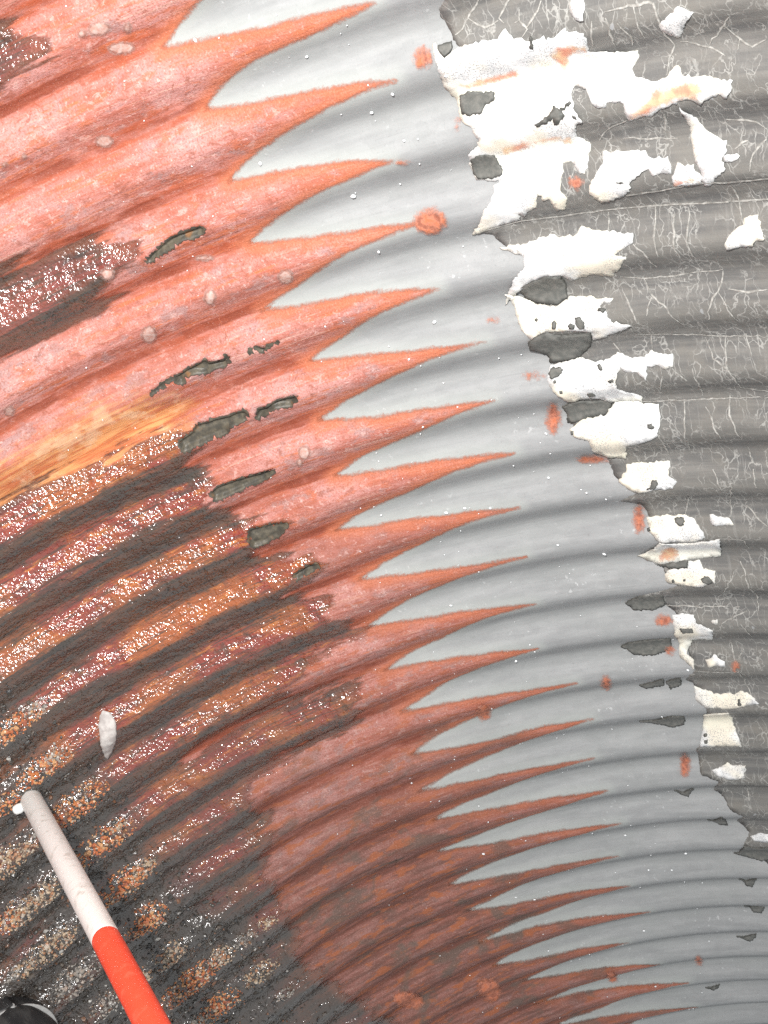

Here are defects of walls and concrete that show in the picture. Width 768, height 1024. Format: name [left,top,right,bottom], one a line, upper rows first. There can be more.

crack [455,0,541,37]
crack [590,0,766,75]
peeling [432,0,740,235]
crack [599,114,678,140]
crack [726,119,767,225]
rust [0,0,516,566]
peeling [500,226,677,494]
rust [544,404,560,433]
peeling [638,514,734,588]
peeling [621,595,725,670]
peeling [639,678,759,748]
rust [176,506,697,1024]